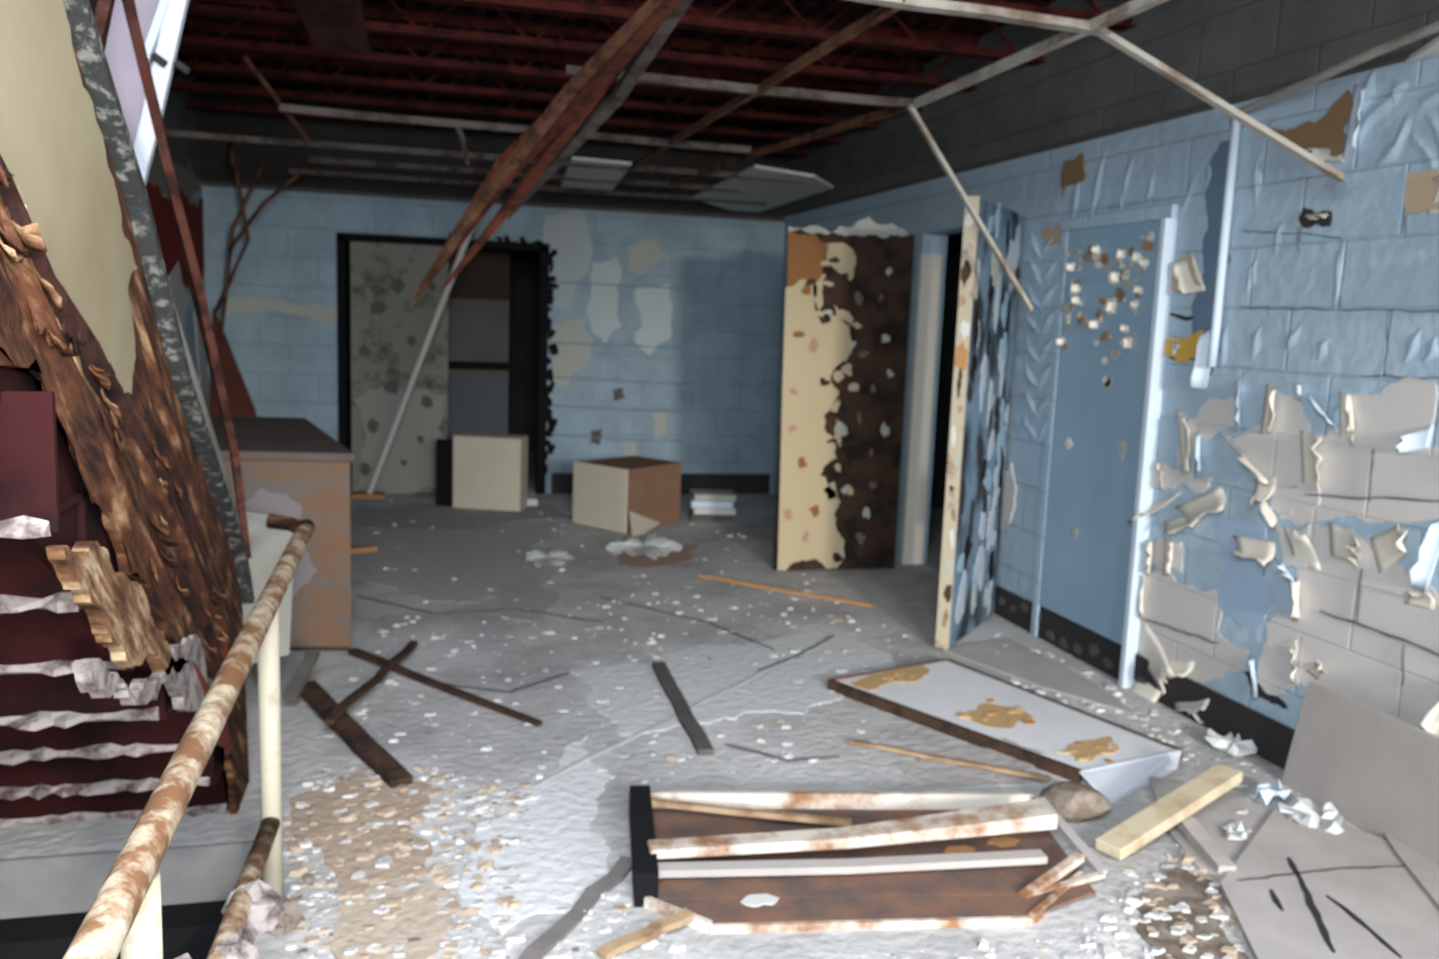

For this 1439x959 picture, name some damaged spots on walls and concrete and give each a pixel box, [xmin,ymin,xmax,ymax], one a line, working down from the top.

peeling [145,151,208,395]
peeling [806,257,894,495]
peeling [942,202,1021,628]
peeling [1042,224,1155,398]
peeling [1404,169,1439,216]
peeling [0,515,51,539]
peeling [0,660,74,677]
peeling [0,592,82,614]
corrosion [150,442,230,668]
peeling [830,507,870,545]
peeling [1134,377,1439,730]